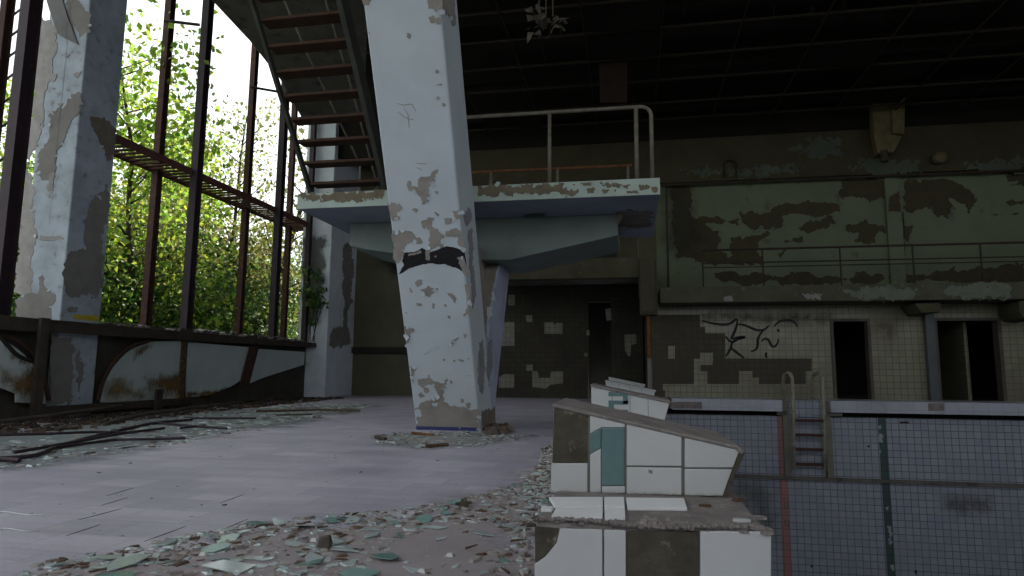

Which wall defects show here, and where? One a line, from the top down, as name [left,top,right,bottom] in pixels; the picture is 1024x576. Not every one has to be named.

peeling [427,0,456,26]
peeling [14,17,117,320]
peeling [477,152,1024,302]
peeling [297,169,498,395]
rust [108,374,226,398]
peeling [410,365,496,431]
peeling [652,315,812,409]